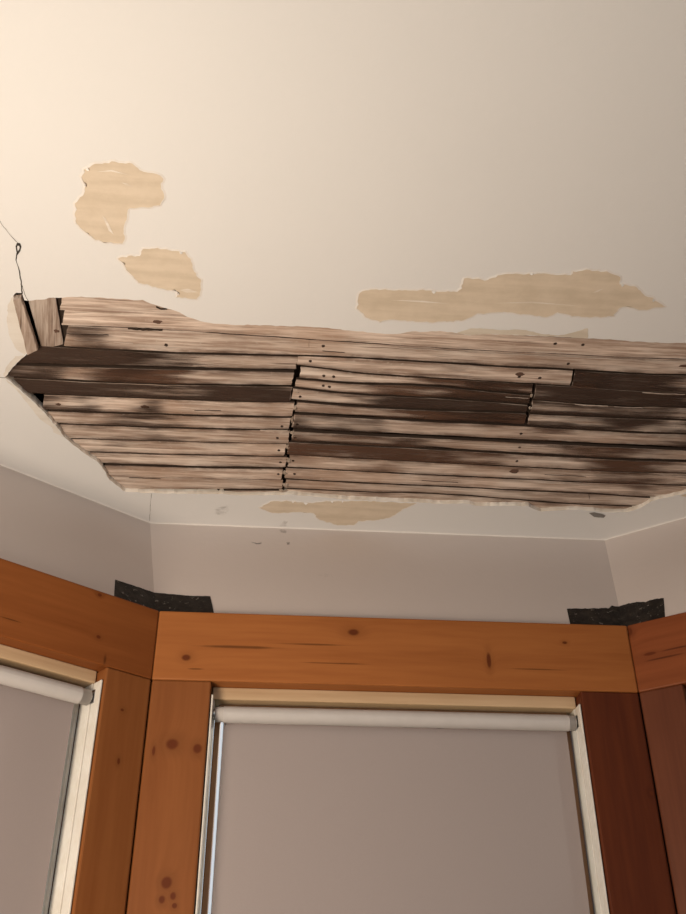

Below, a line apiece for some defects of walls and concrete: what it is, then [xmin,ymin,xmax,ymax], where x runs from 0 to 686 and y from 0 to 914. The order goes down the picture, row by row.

crack [0,222,28,300]
peeling [72,159,203,300]
spalling [3,268,686,526]